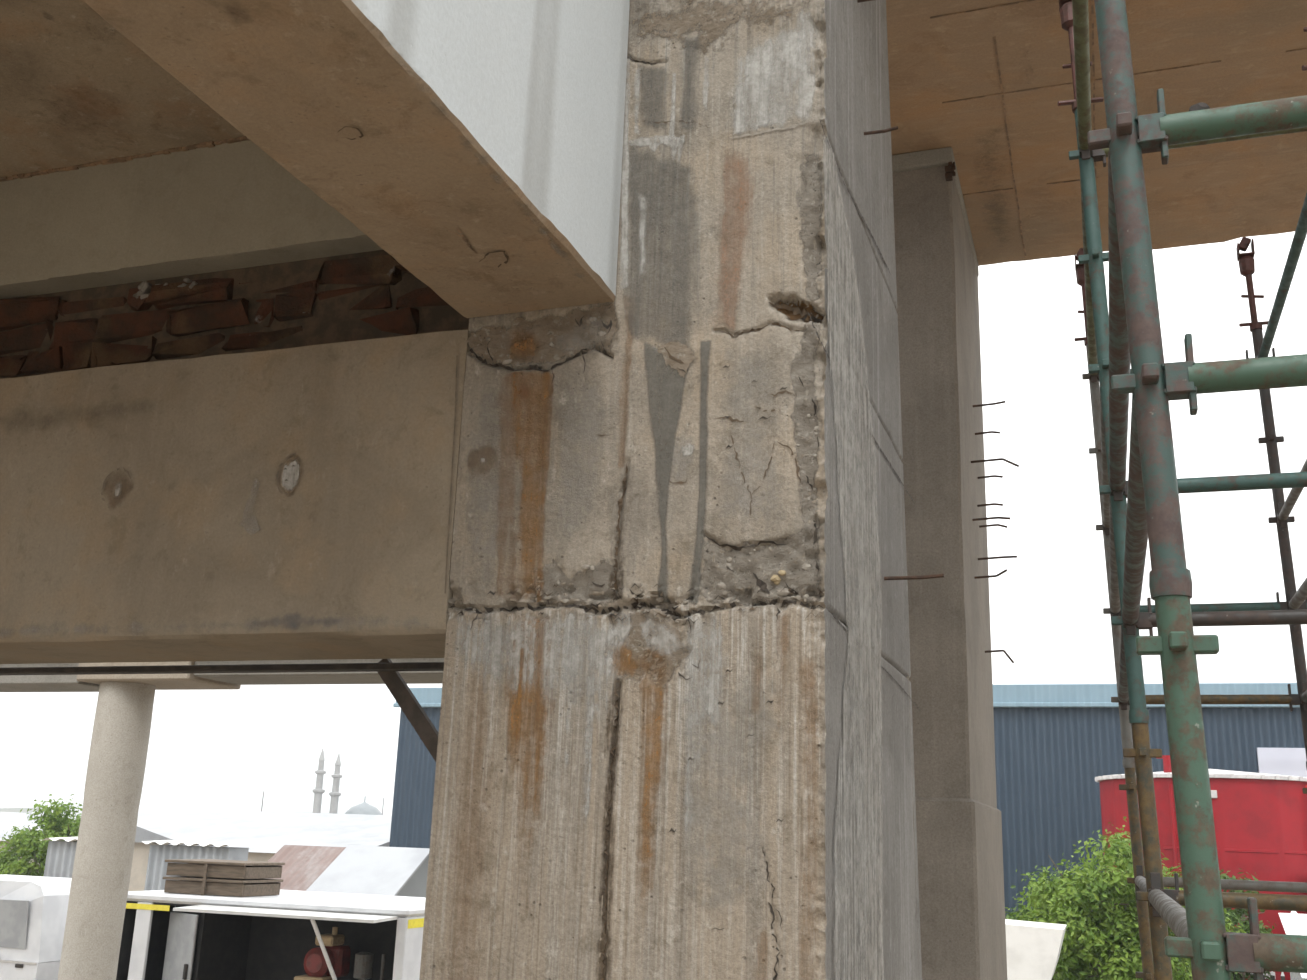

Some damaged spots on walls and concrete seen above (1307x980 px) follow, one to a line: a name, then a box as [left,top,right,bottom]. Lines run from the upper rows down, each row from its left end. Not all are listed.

corrosion [721,160,749,327]
spalling [467,303,618,368]
damp [610,464,628,597]
damp [621,41,722,830]
crack [704,390,801,551]
spalling [699,153,823,605]
crack [724,310,913,502]
corrosion [508,619,550,808]
spalling [531,559,700,689]
corrosion [642,650,665,876]
crack [450,583,920,711]
crack [762,849,782,980]